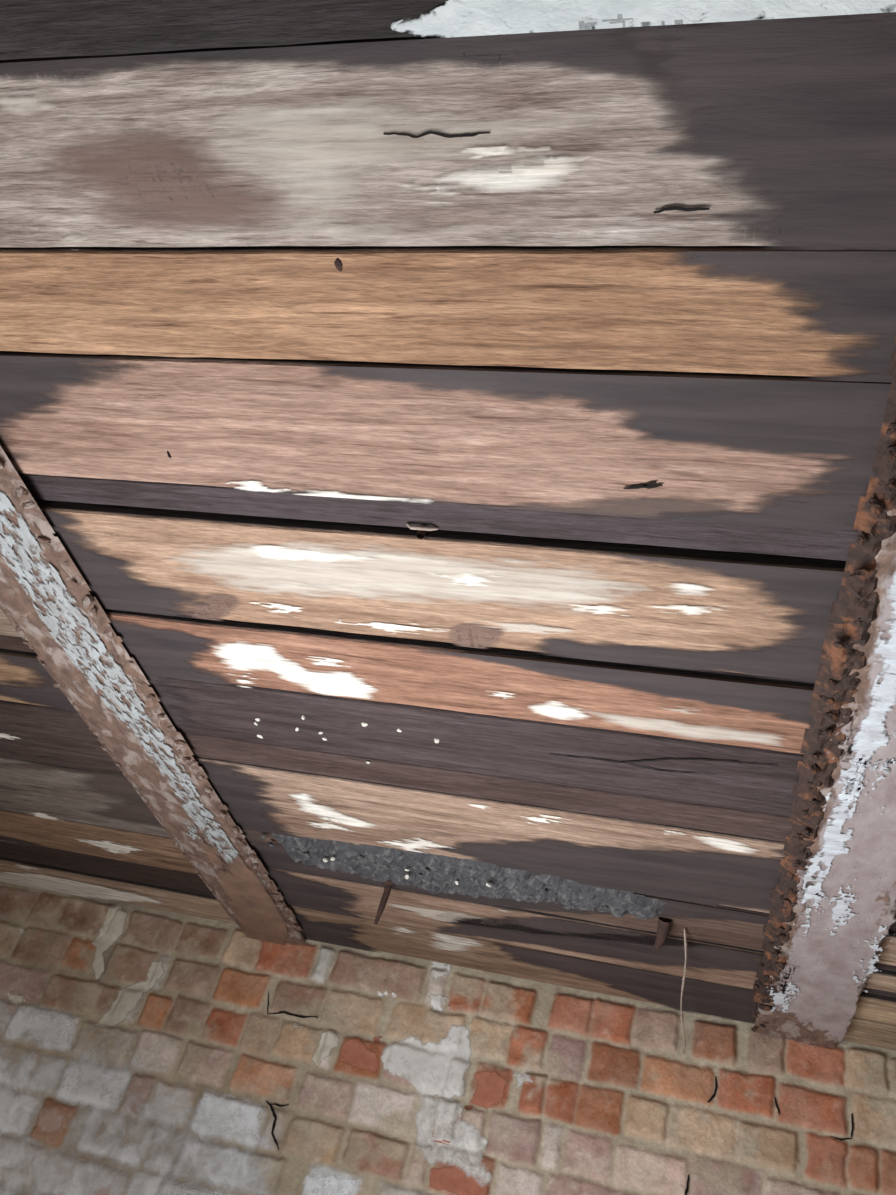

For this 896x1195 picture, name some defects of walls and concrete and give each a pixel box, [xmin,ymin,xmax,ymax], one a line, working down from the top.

peeling [391,0,896,38]
peeling [0,492,243,863]
peeling [306,657,343,666]
rust [751,335,896,1032]
peeling [767,557,896,1042]
peeling [310,822,347,830]
peeling [377,838,449,853]
peeling [429,961,452,979]
peeling [0,1001,267,1195]
crack [266,1100,289,1150]
peeling [302,1173,358,1195]
spalling [430,1164,488,1195]